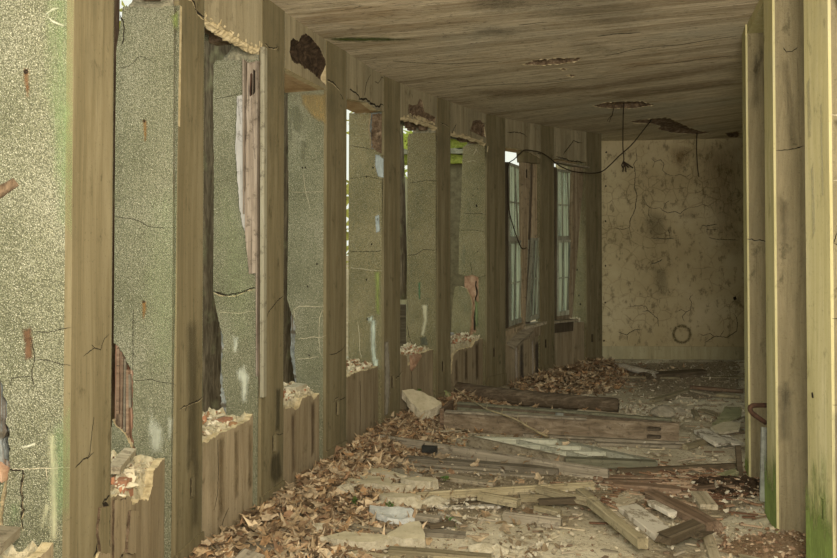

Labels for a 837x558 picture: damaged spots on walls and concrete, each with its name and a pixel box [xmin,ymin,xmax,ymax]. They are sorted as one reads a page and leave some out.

spalling [290,33,326,81]
spalling [522,58,581,78]
spalling [400,99,437,131]
spalling [450,120,486,146]
spalling [630,117,710,135]
crack [616,153,764,242]
spalling [115,347,132,438]
crack [10,420,94,530]